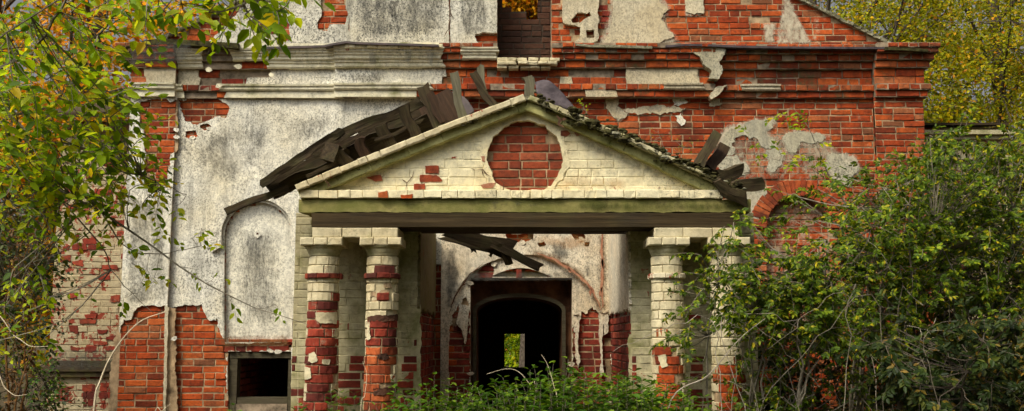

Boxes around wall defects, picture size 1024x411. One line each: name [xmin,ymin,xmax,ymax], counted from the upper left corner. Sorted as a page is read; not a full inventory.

peeling [551,0,675,44]
peeling [685,0,704,15]
spalling [139,64,247,186]
peeling [718,117,826,175]
peeling [826,153,860,186]
peeling [60,235,104,267]
spalling [374,265,395,273]
spalling [466,262,497,285]
spalling [371,290,390,302]
spalling [69,293,422,411]
spalling [448,298,474,408]
spalling [568,308,612,405]